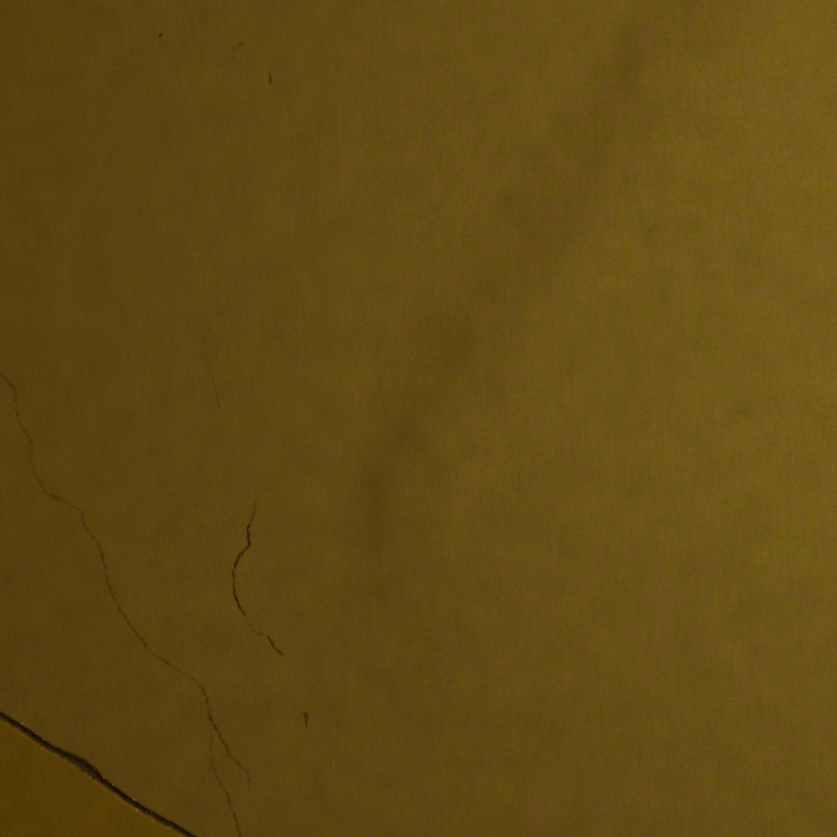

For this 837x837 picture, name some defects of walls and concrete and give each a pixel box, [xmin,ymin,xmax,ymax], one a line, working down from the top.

crack [233,525,251,609]
crack [0,713,195,837]